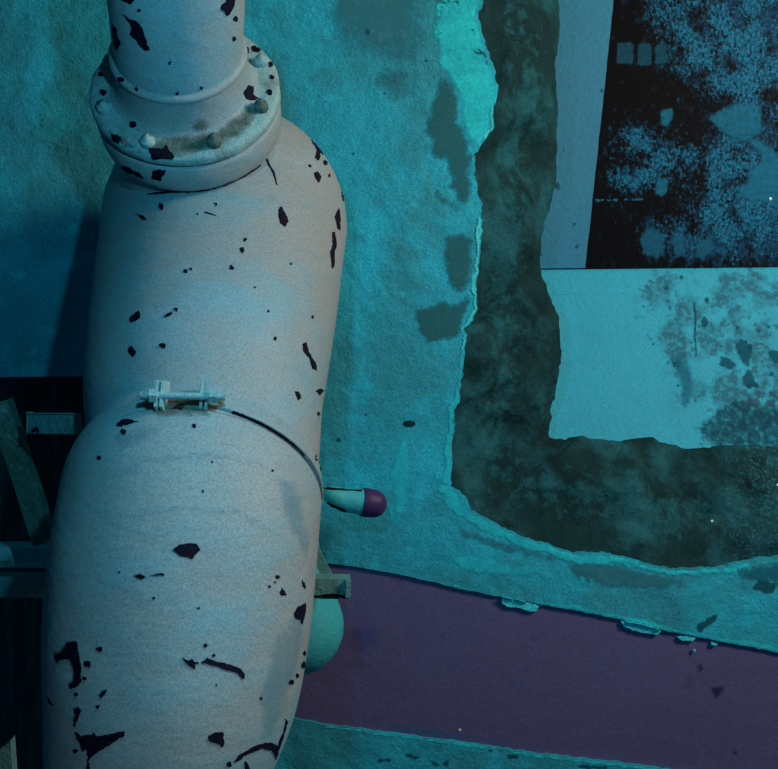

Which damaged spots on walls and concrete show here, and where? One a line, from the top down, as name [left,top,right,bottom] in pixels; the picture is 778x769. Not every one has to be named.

damp [339,0,422,54]
damp [427,82,471,205]
damp [418,234,472,341]
flaking render [458,217,483,377]
damp [673,359,691,402]
damp [720,339,759,389]
flaking render [437,389,750,575]